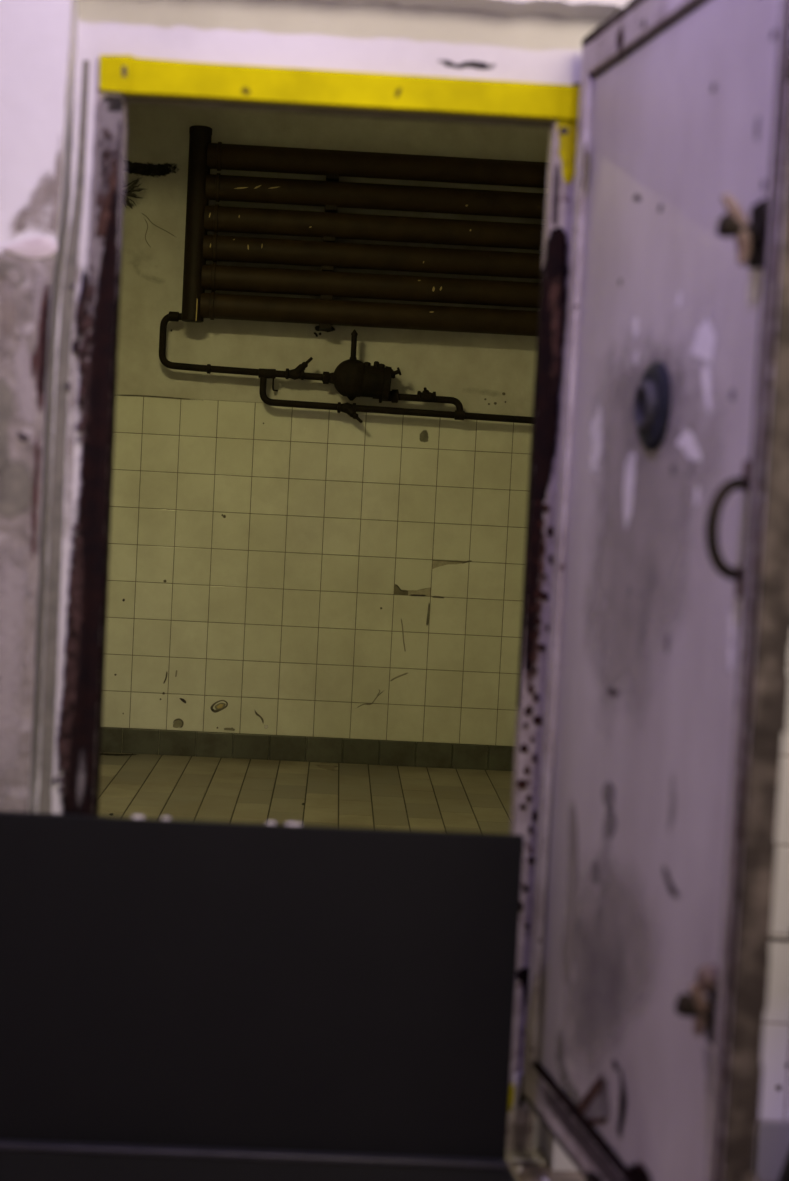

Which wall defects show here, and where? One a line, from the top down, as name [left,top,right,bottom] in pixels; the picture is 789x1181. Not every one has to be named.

peeling [0,237,58,812]
rust [53,98,124,816]
rust [516,165,569,1018]